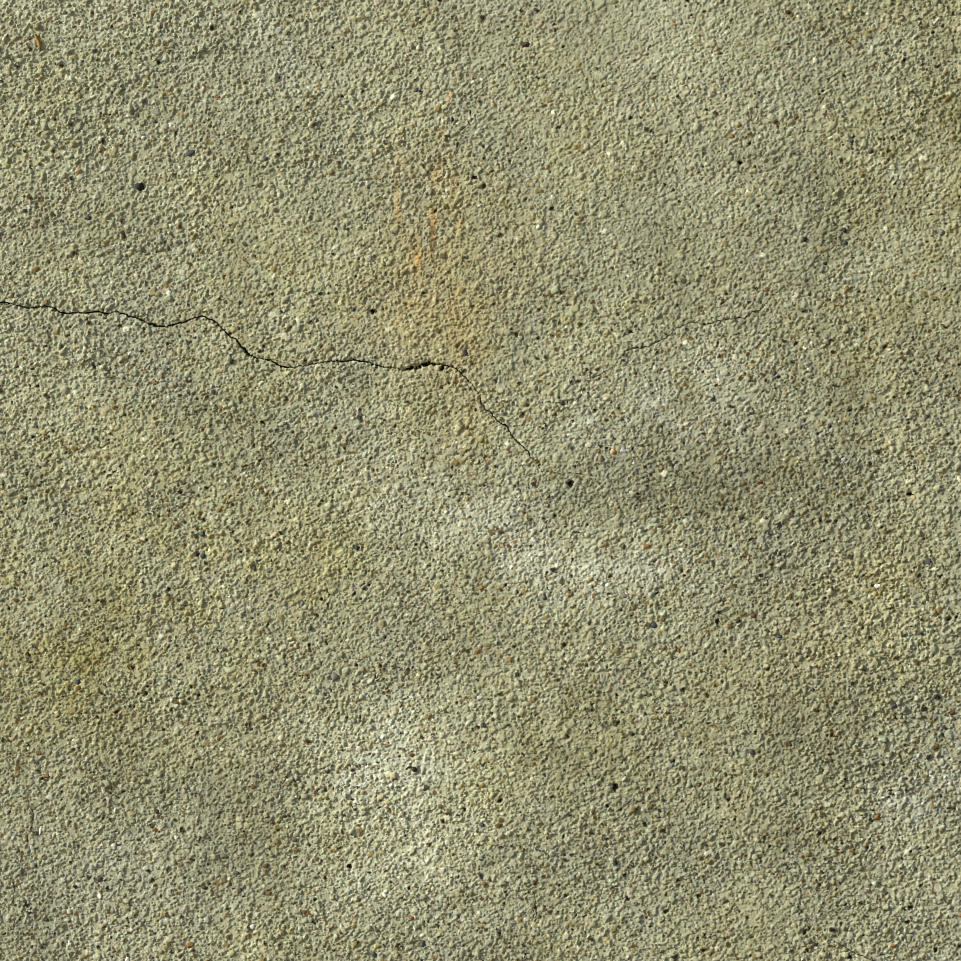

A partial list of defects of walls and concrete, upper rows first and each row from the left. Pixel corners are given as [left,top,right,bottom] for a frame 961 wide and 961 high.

crack [0,233,849,476]